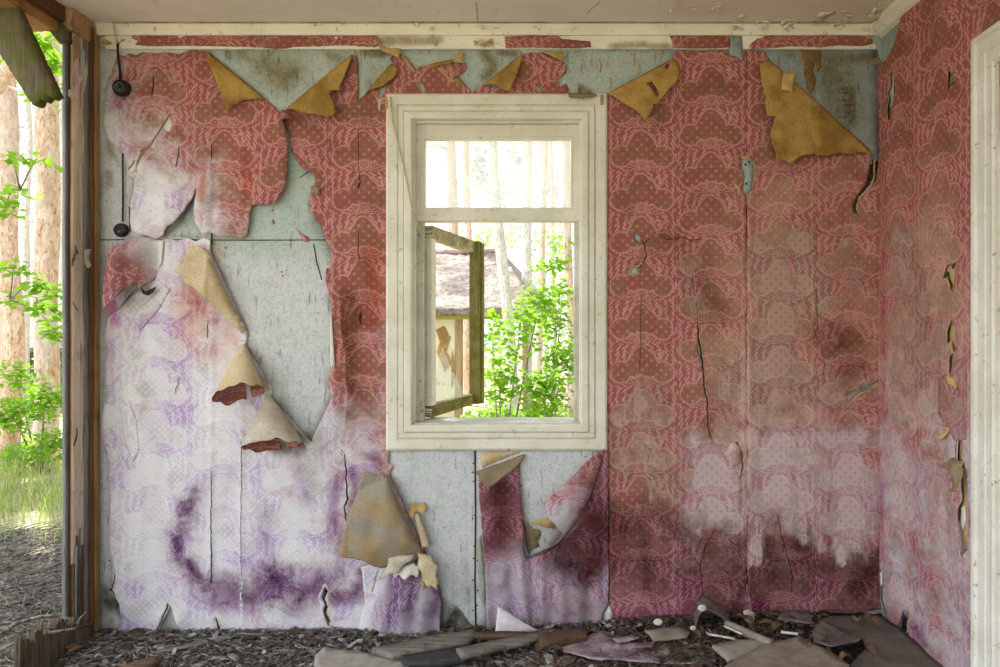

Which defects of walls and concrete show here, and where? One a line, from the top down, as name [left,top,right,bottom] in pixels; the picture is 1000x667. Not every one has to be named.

peeling [200,21,523,123]
peeling [540,50,681,121]
peeling [729,4,894,213]
crack [638,237,702,268]
peeling [84,39,335,634]
crack [692,206,748,597]
damp [609,226,878,567]
damp [209,569,322,603]
crack [340,450,349,521]
peeling [337,449,605,630]
crack [777,513,793,593]
peeling [938,422,968,557]